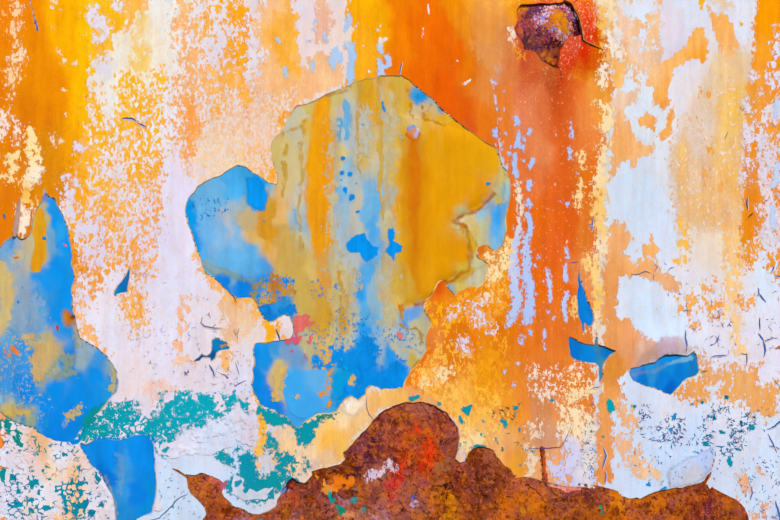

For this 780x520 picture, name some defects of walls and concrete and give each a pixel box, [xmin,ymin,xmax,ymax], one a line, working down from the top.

rust [0,412,34,470]
rust [48,491,85,520]
rust [133,293,199,411]
rust [0,0,348,359]
peeling [0,0,540,520]
rust [186,0,780,520]
peeling [516,0,631,489]
peeling [629,351,700,395]